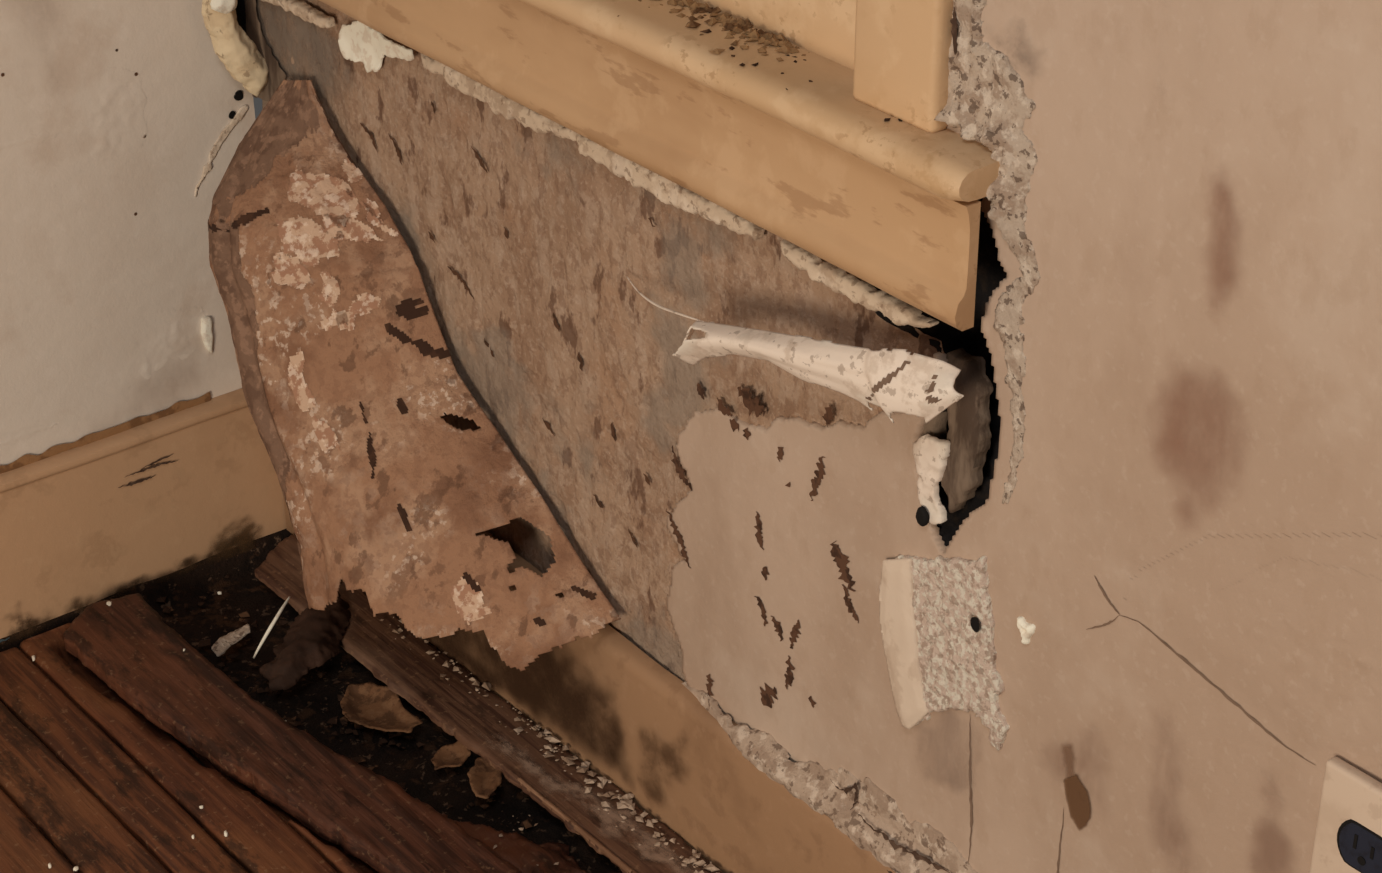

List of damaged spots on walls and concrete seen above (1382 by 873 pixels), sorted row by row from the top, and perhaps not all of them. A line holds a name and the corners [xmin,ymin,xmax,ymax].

peeling [201,316,213,353]
spalling [256,0,1041,873]
crack [1086,576,1313,764]